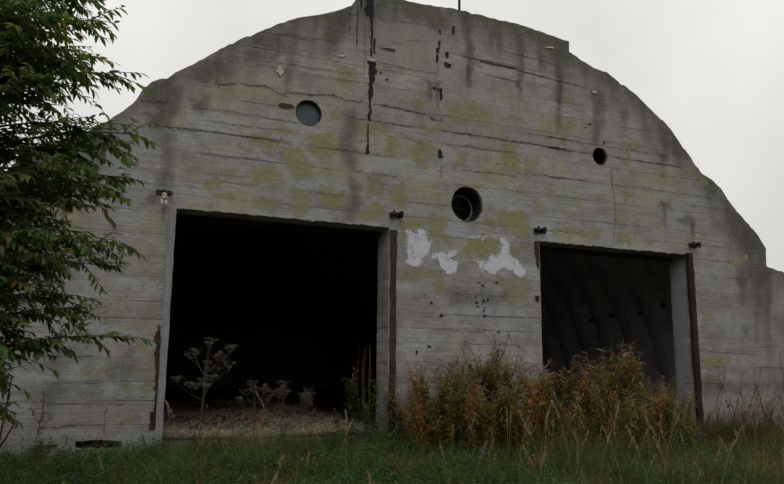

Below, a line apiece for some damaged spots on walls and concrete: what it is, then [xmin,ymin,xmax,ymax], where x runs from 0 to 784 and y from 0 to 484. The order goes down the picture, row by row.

damp [464,12,472,78]
crack [150,107,291,177]
crack [196,5,682,238]
peeling [405,228,526,284]